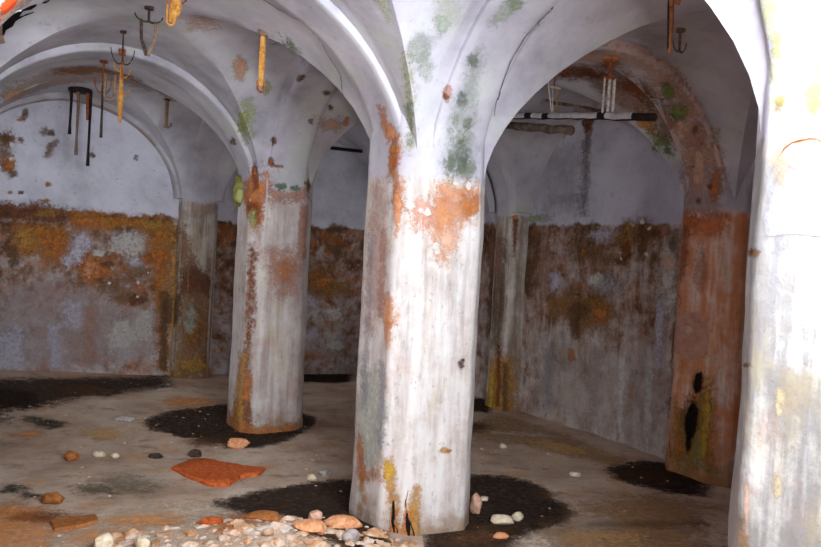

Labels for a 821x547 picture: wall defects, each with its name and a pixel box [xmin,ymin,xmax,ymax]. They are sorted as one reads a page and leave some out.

flaking render [0,0,31,22]
crack [2,0,50,36]
damp [404,62,414,146]
rust [378,105,408,237]
damp [448,140,475,177]
crack [779,138,821,157]
rust [269,205,308,299]
damp [0,301,173,429]
rust [228,244,300,434]
rust [669,378,715,473]
spalling [683,371,703,453]
crack [391,493,415,536]